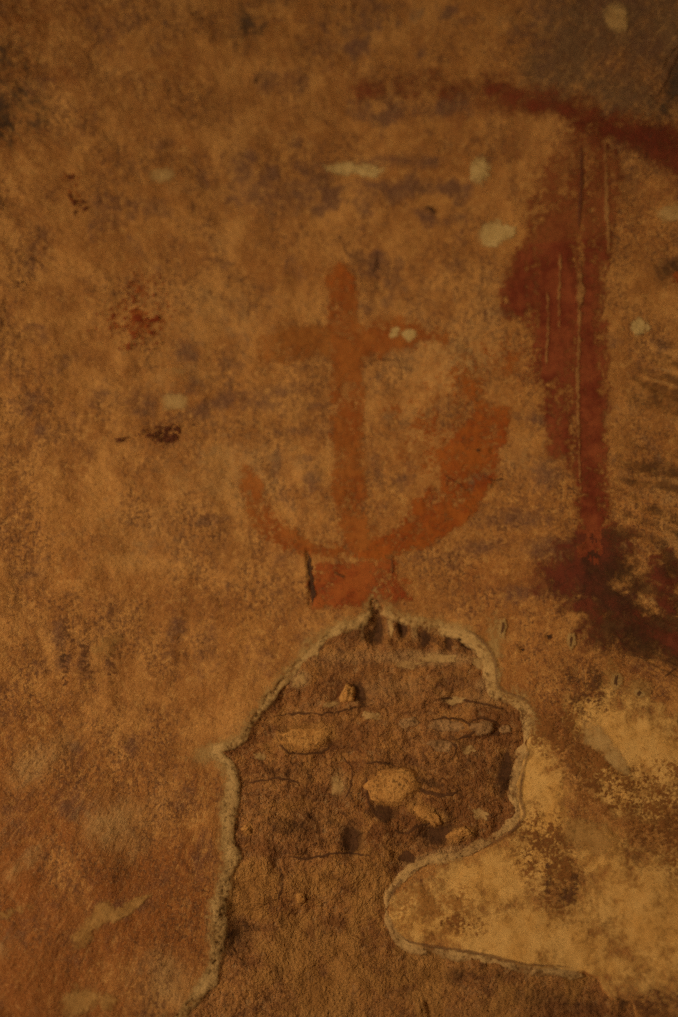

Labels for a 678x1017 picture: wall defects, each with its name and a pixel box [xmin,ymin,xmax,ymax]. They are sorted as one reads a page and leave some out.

crack [307,552,345,605]
flaking render [175,587,678,1017]